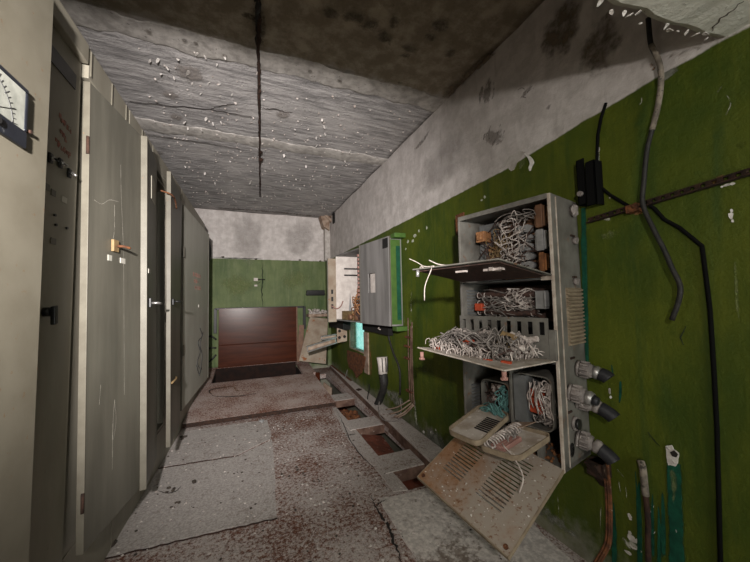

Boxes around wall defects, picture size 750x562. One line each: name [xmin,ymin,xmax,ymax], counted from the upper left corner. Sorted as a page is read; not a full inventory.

damp [542,3,579,54]
peeling [663,23,709,40]
crack [215,257,263,306]
flaking render [665,445,679,466]
crack [371,495,401,561]
flaking render [624,531,642,555]